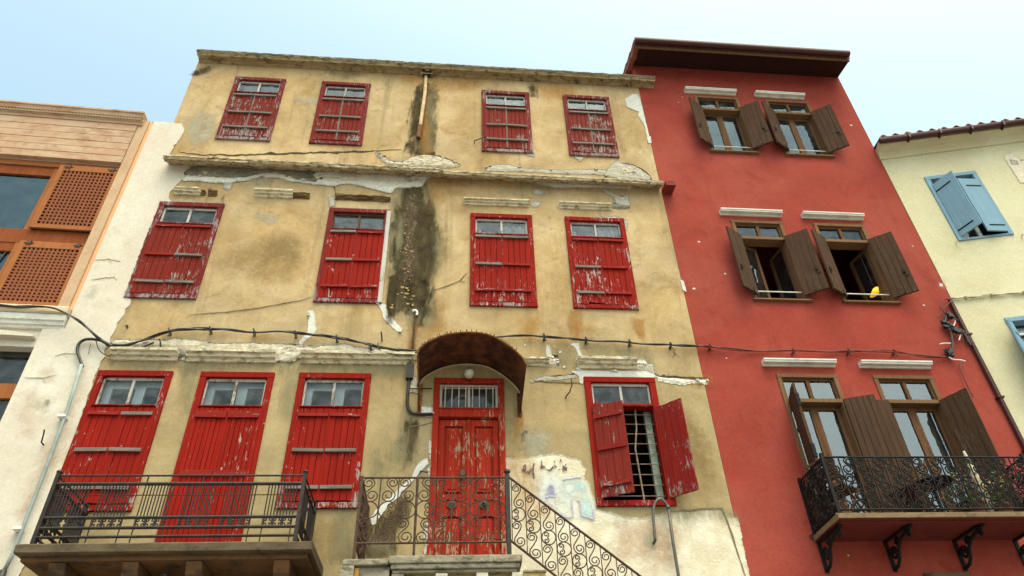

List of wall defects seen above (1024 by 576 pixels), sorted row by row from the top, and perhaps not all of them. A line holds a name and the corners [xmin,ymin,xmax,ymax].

leakage [404,84,438,156]
peeling [625,94,652,143]
peeling [182,151,461,193]
spalling [485,160,652,230]
leakage [387,187,439,326]
spalling [110,337,399,363]
spalling [527,351,580,373]
spalling [617,356,709,385]
peeling [506,434,750,576]